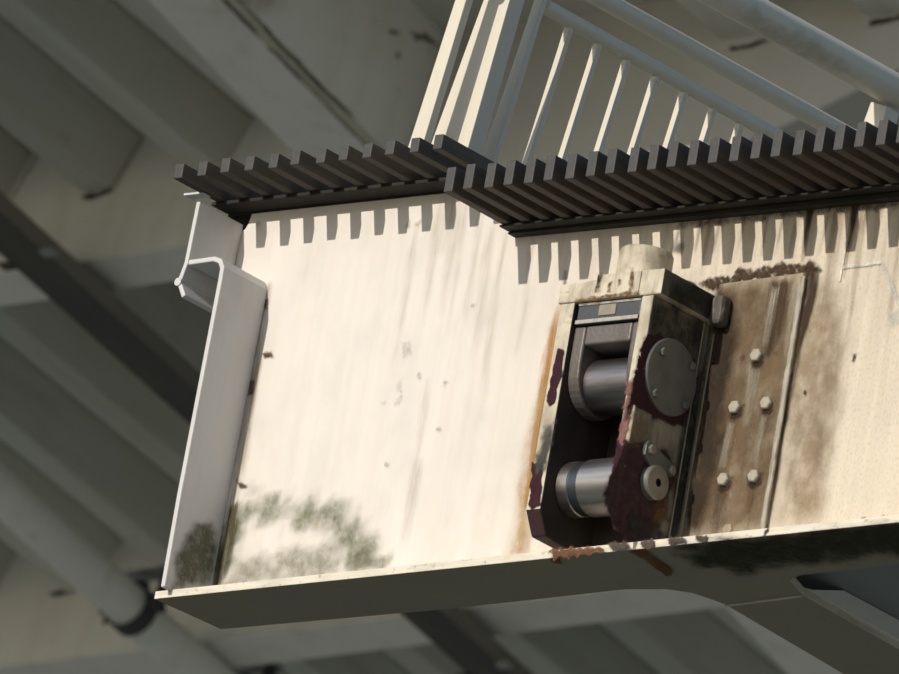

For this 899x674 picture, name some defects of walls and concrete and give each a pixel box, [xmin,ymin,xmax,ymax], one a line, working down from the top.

corrosion [577,270,639,302]
corrosion [516,312,560,552]
corrosion [687,260,821,529]
leakage [214,503,238,585]
corrosion [629,550,672,576]